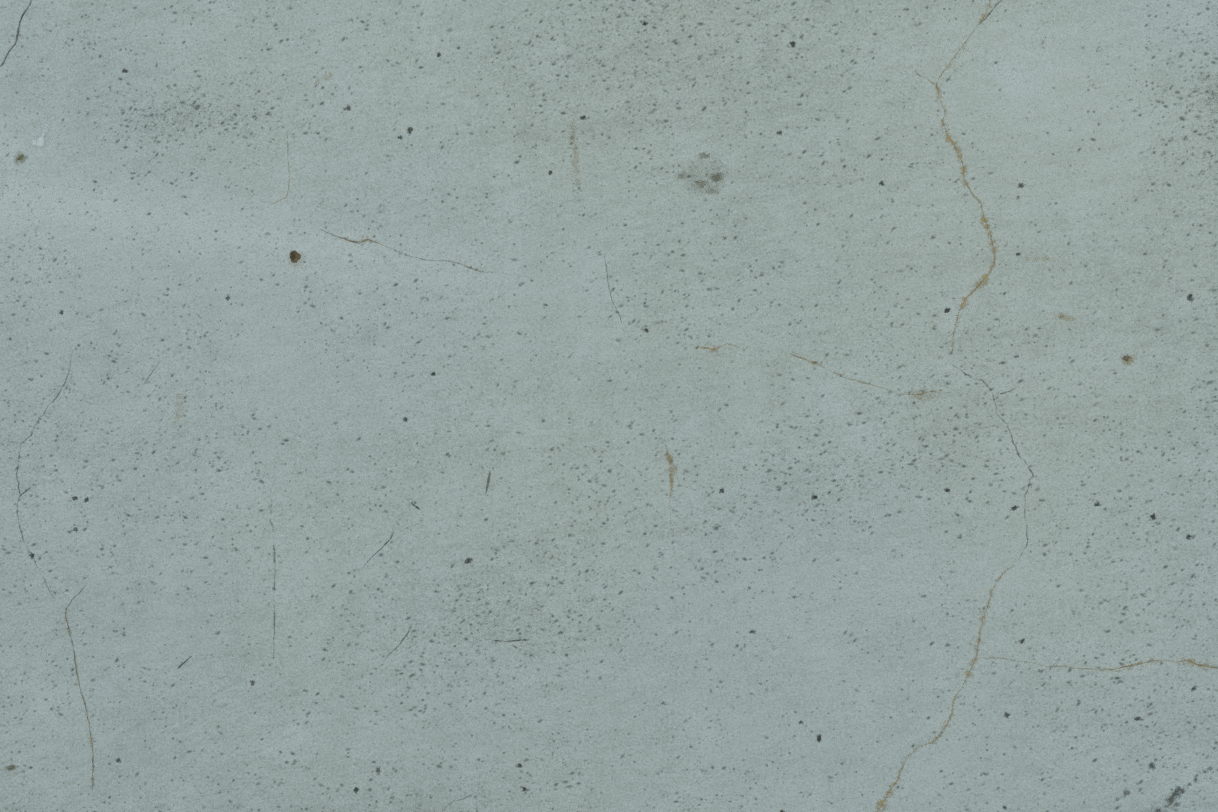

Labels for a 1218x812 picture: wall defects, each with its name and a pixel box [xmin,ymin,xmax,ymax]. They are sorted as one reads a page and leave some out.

crack [918,74,995,307]